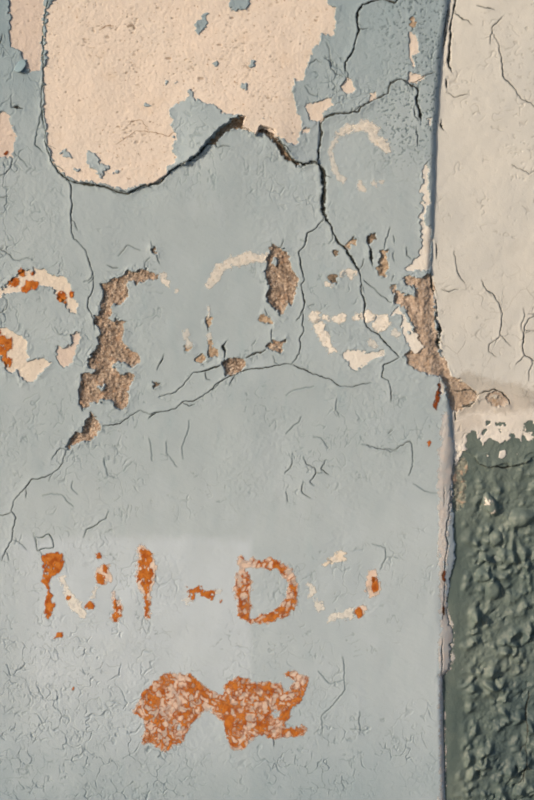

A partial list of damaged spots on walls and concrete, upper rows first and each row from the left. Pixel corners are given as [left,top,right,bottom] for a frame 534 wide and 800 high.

peeling [0,112,17,158]
crack [11,1,224,328]
peeling [8,0,336,190]
crack [107,0,534,426]
peeling [0,266,78,314]
flaking render [258,244,299,324]
peeling [0,328,81,382]
flaking render [66,268,159,450]
flaking render [194,339,246,375]
flaking render [266,339,286,353]
crack [362,431,455,616]